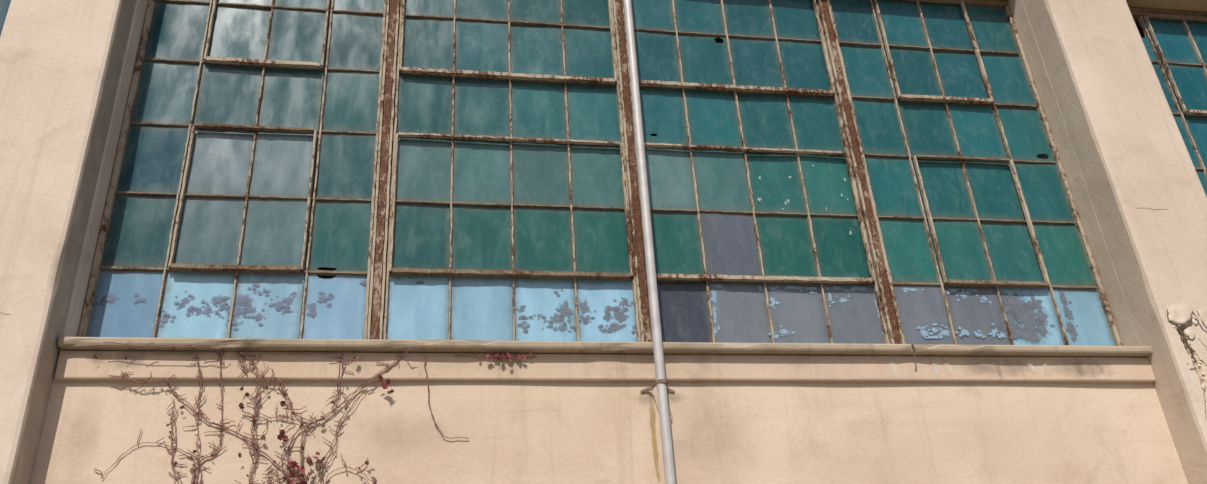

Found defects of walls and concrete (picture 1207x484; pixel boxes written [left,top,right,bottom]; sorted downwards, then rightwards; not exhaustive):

spalling [1173,315,1207,391]